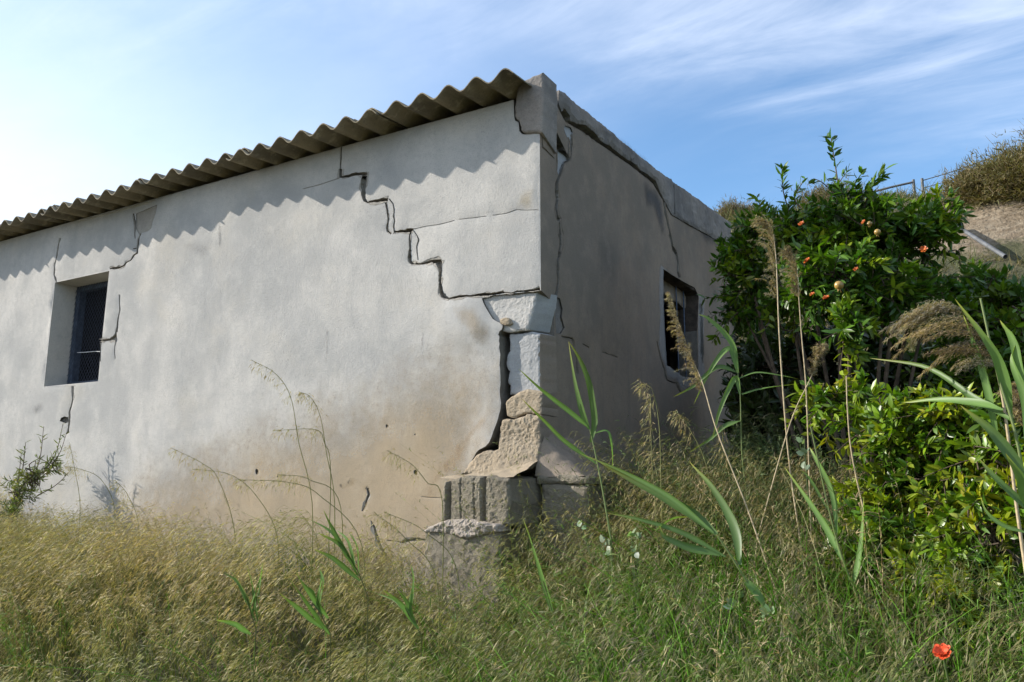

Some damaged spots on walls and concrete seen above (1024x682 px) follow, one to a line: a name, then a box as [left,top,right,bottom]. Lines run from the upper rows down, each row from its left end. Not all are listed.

crack [304,106,681,301]
crack [53,238,61,283]
crack [110,214,141,270]
crack [99,295,120,361]
crack [66,386,74,434]